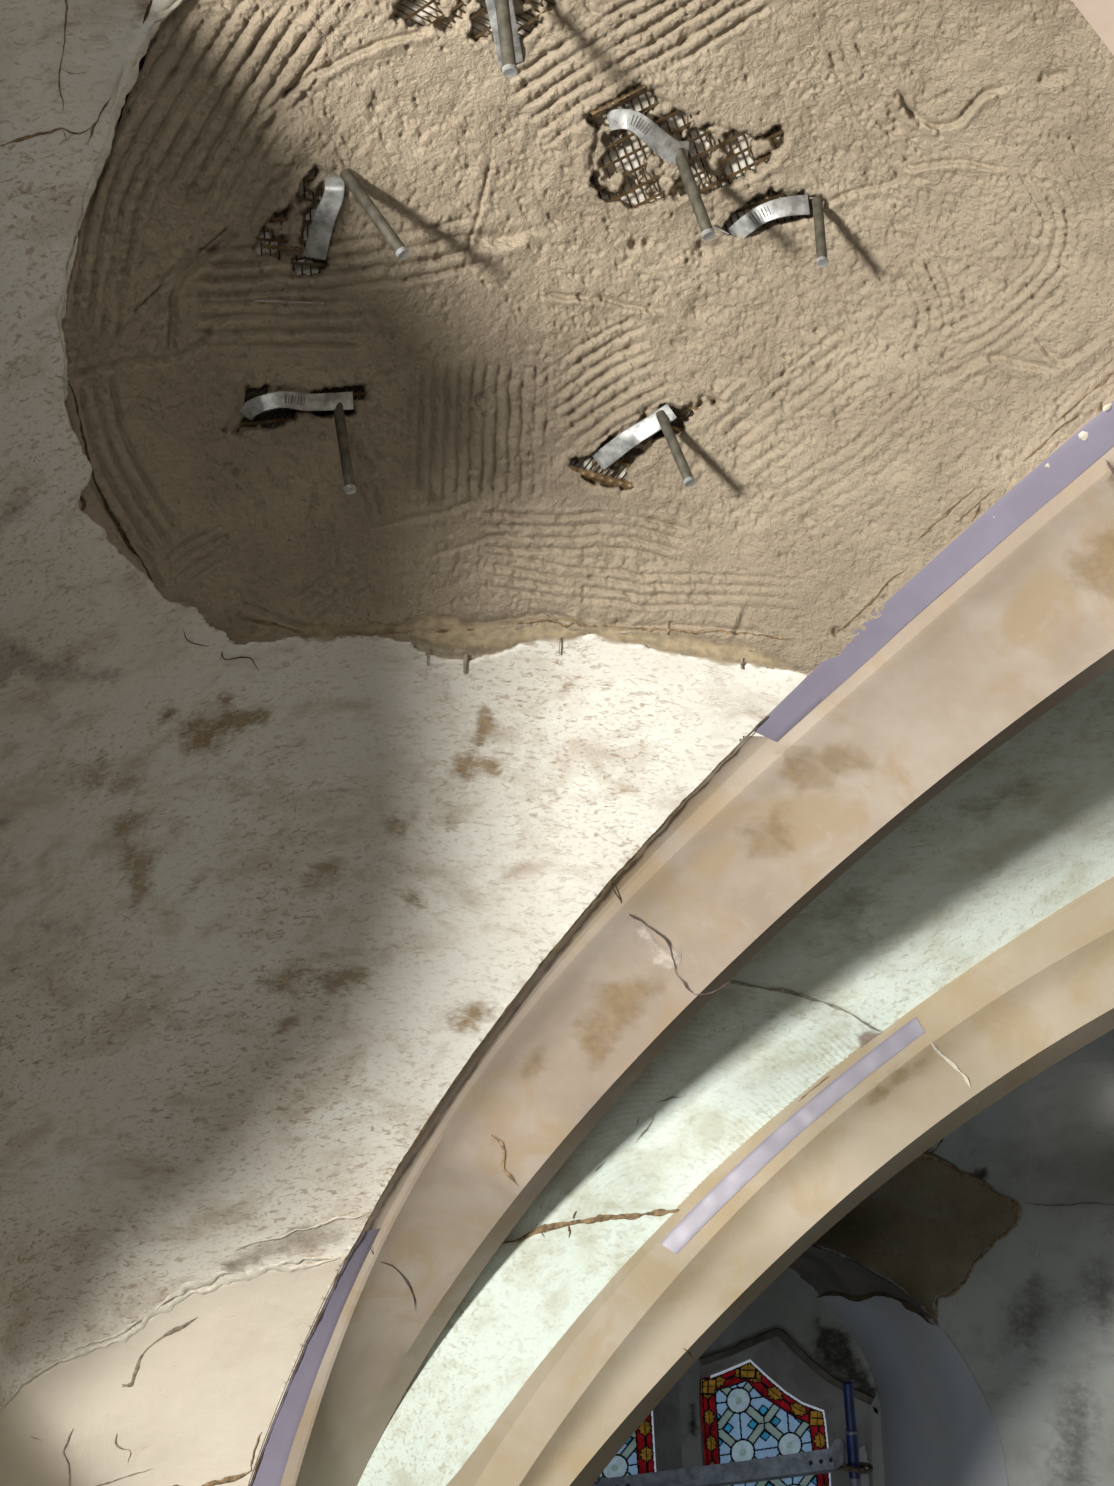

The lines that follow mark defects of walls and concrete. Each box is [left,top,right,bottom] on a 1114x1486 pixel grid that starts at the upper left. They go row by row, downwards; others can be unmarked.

crack [0,0,152,146]
flaking render [61,0,1114,674]
crack [1024,371,1114,460]
crack [833,488,994,636]
damp [183,698,267,751]
damp [456,709,498,778]
crack [31,716,883,1486]
crack [930,1041,979,1104]
flaking render [789,1152,1021,1326]